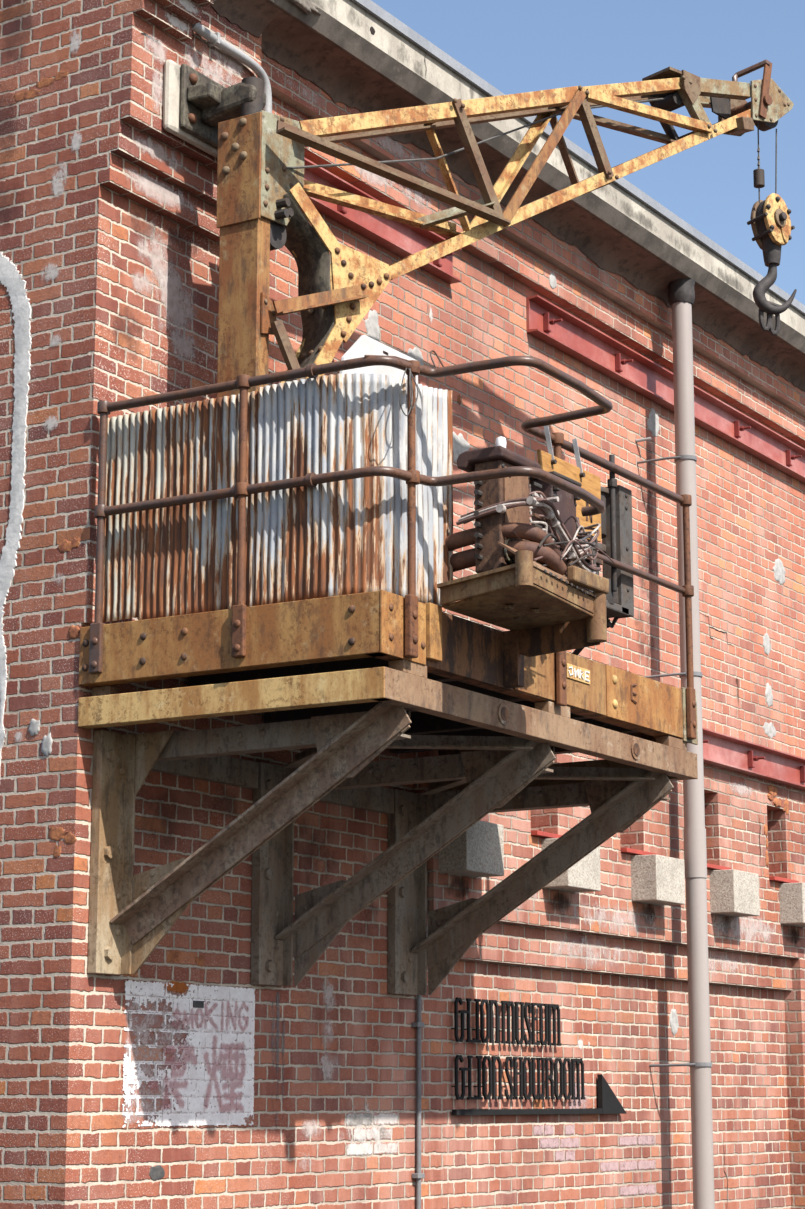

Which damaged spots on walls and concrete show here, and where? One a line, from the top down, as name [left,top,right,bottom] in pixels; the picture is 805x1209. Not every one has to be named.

crack [0,252,32,768]
peeling [124,1002,158,1048]
peeling [122,1104,153,1128]